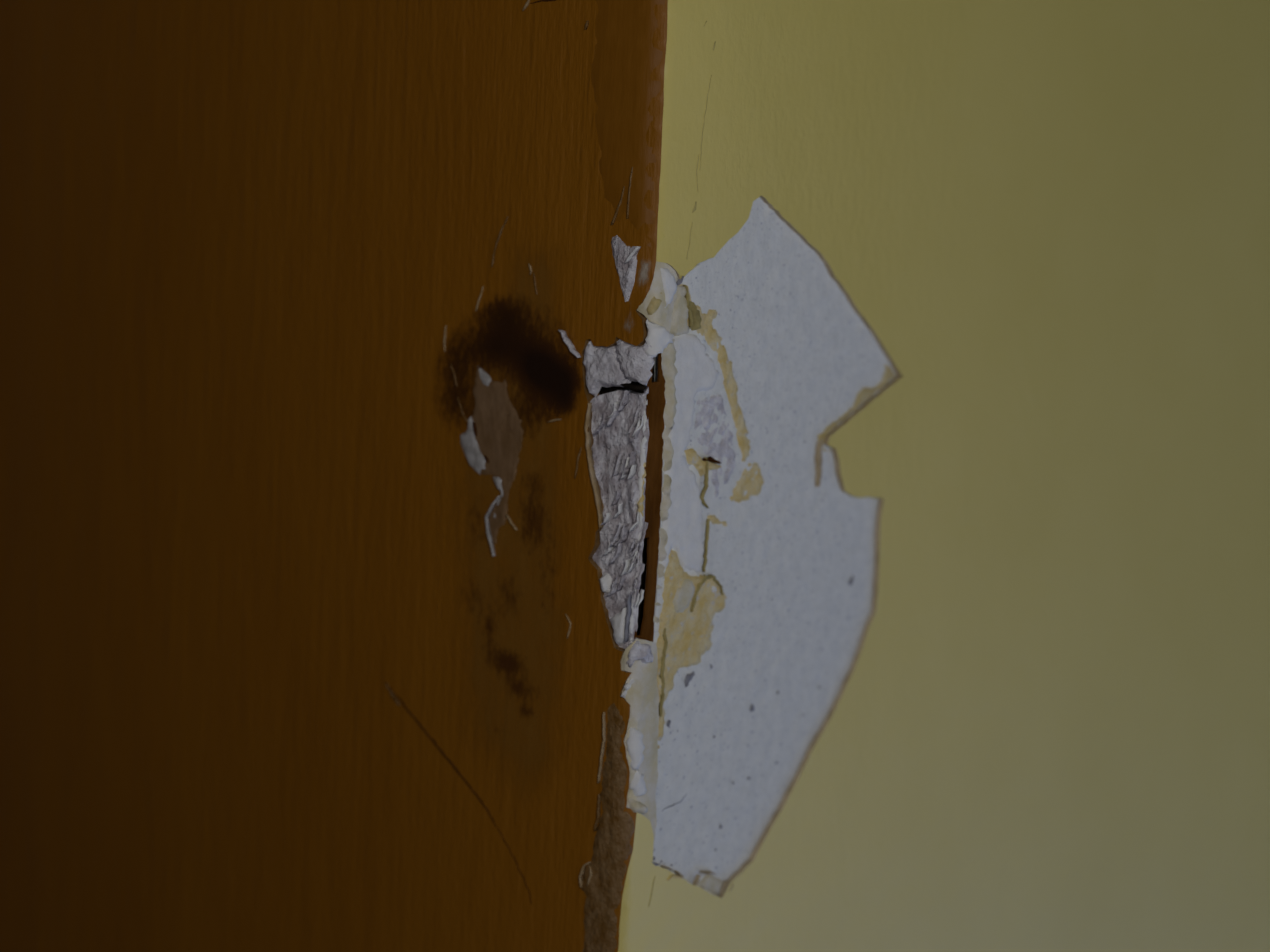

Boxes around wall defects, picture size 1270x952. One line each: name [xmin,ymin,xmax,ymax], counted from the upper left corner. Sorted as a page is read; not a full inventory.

leakage [438,296,580,425]
peeling [460,365,524,556]
peeling [558,197,898,952]